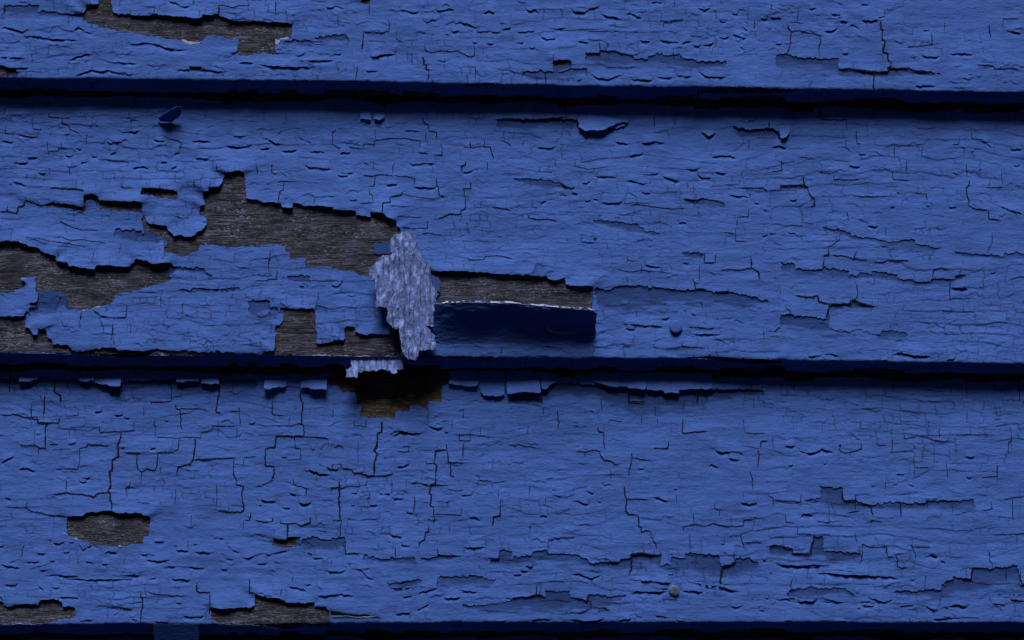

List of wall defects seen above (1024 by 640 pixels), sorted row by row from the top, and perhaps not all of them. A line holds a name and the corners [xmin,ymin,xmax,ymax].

peeling [4,0,349,56]
crack [843,12,945,89]
peeling [0,170,783,418]
crack [332,118,524,236]
crack [687,121,929,317]
peeling [64,510,150,548]
crack [97,582,211,623]
peeling [153,594,373,640]
crack [3,372,560,567]
crack [578,389,704,573]
crack [676,420,935,584]
crack [839,380,1024,590]